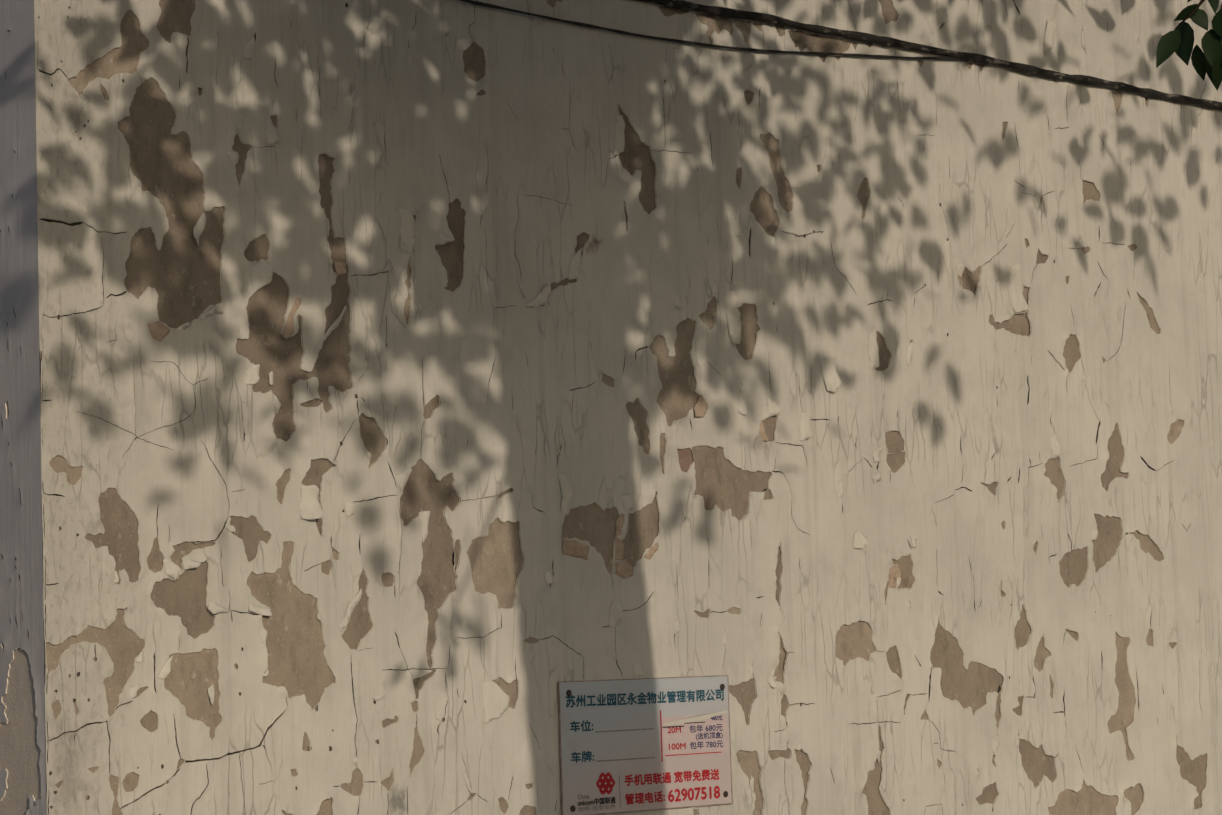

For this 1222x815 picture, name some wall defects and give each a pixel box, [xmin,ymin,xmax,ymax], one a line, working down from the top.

crack [40,219,126,234]
crack [49,292,124,318]
peeling [68,0,226,341]
peeling [236,153,356,441]
crack [345,495,395,516]
peeling [677,445,774,521]
crack [773,413,826,473]
peeling [0,487,230,815]
crack [185,726,270,763]
peeling [225,515,336,711]
peeling [394,459,524,776]
peeling [930,618,1024,767]